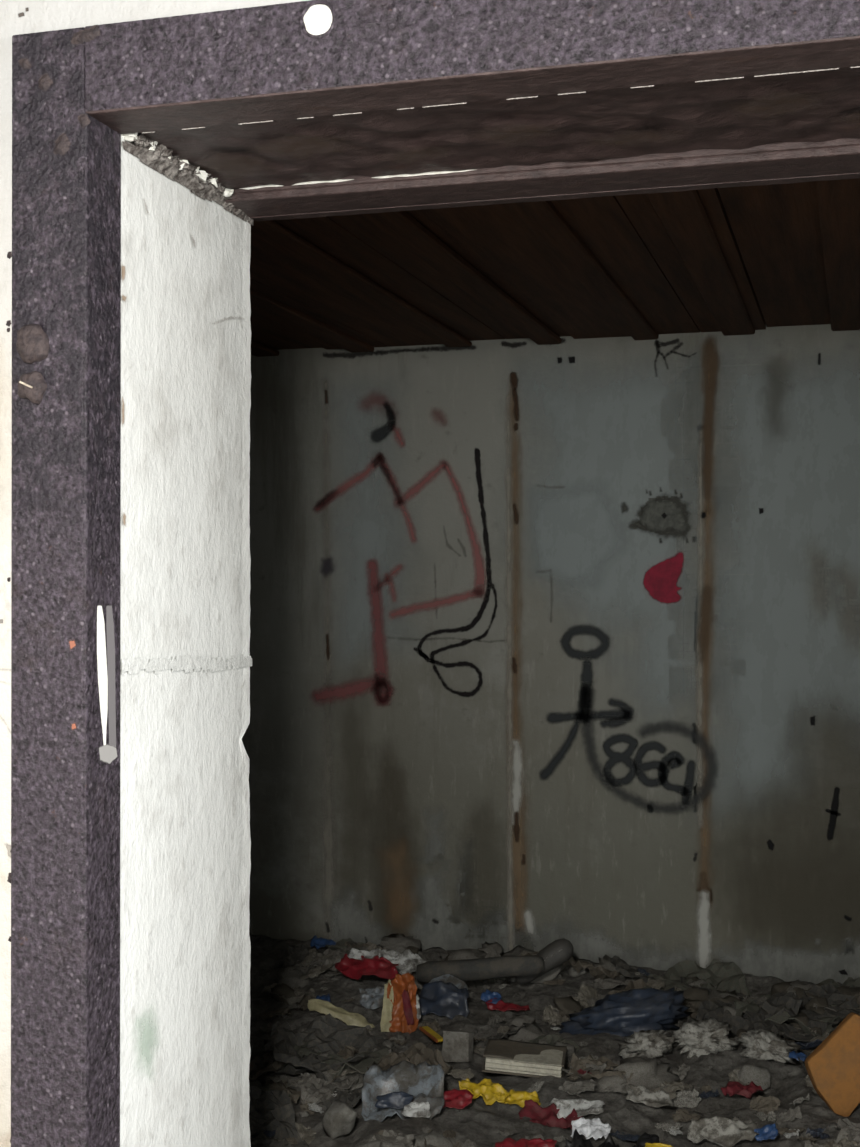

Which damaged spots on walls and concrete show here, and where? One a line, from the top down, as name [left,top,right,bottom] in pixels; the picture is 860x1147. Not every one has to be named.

spalling [121,131,354,225]
peeling [371,169,477,178]